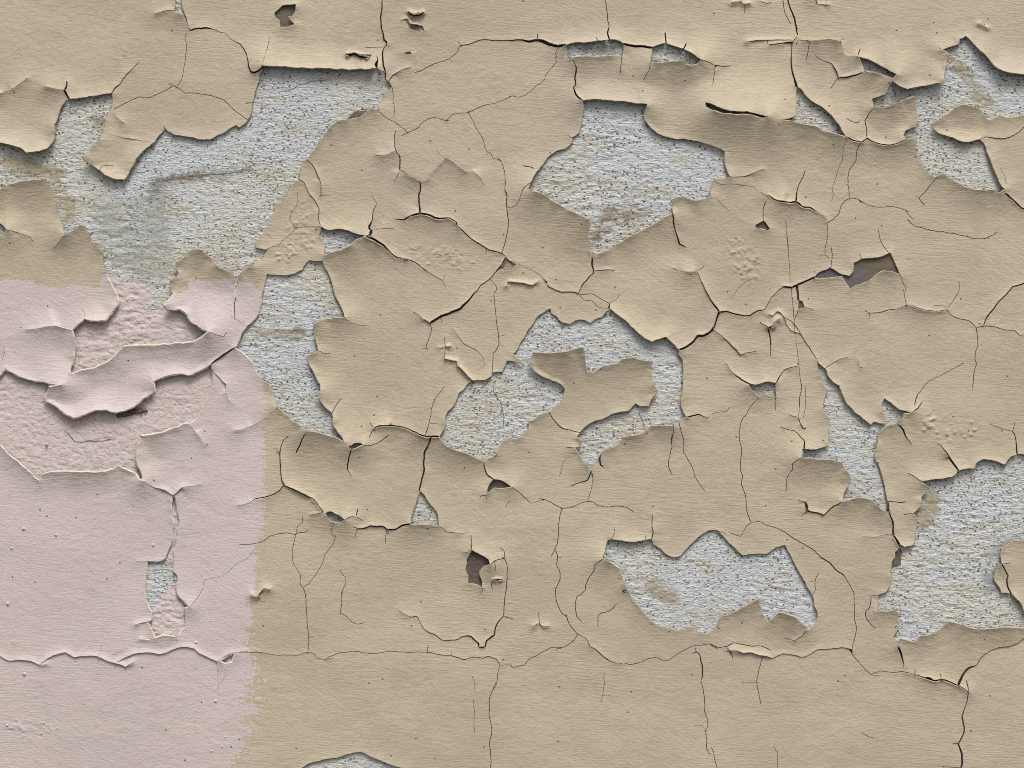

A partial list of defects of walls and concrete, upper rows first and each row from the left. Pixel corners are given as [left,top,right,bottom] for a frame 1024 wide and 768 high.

crack [26,313,73,342]
crack [113,27,280,119]
peeling [0,50,393,498]
crack [347,0,619,426]
peeling [429,307,692,477]
crack [211,110,1024,768]
crack [596,0,686,80]
peeling [507,34,864,262]
crack [744,0,862,88]
peeling [841,34,1024,206]
peeling [584,530,817,640]
peeling [873,452,1024,652]